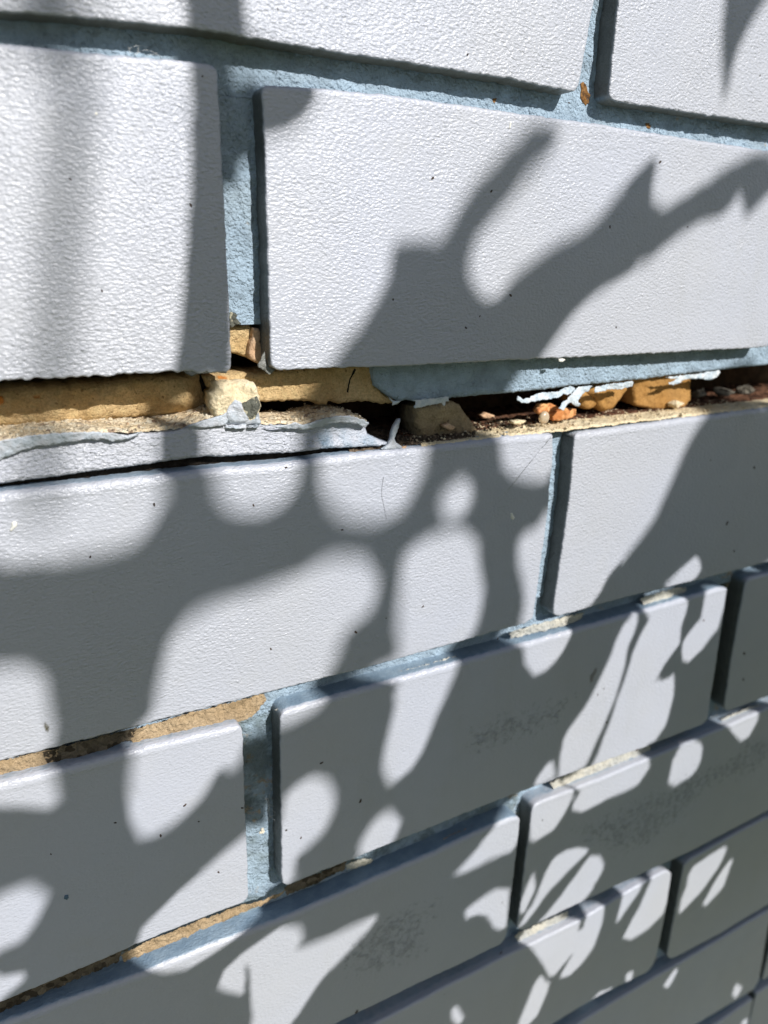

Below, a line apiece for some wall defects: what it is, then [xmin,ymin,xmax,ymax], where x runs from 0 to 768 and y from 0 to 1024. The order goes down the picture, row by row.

spalling [0,312,400,426]
peeling [666,370,720,385]
peeling [413,396,449,408]
peeling [517,381,633,410]
peeling [131,694,267,743]
peeling [0,750,58,775]
peeling [345,859,373,870]
peeling [120,890,286,962]